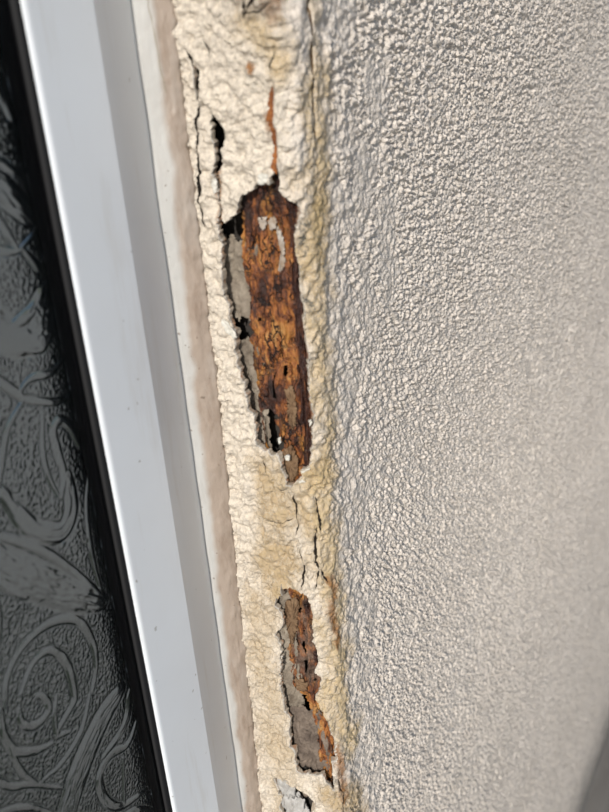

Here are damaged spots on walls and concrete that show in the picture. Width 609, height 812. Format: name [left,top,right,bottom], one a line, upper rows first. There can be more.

crack [242,0,269,20]
crack [148,0,210,227]
crack [266,49,278,174]
crack [307,0,316,166]
spalling [210,114,315,488]
rust [283,364,306,438]
rust [283,445,299,483]
crack [270,487,328,590]
rust [284,592,310,644]
rust [307,461,358,803]
spalling [273,584,338,812]